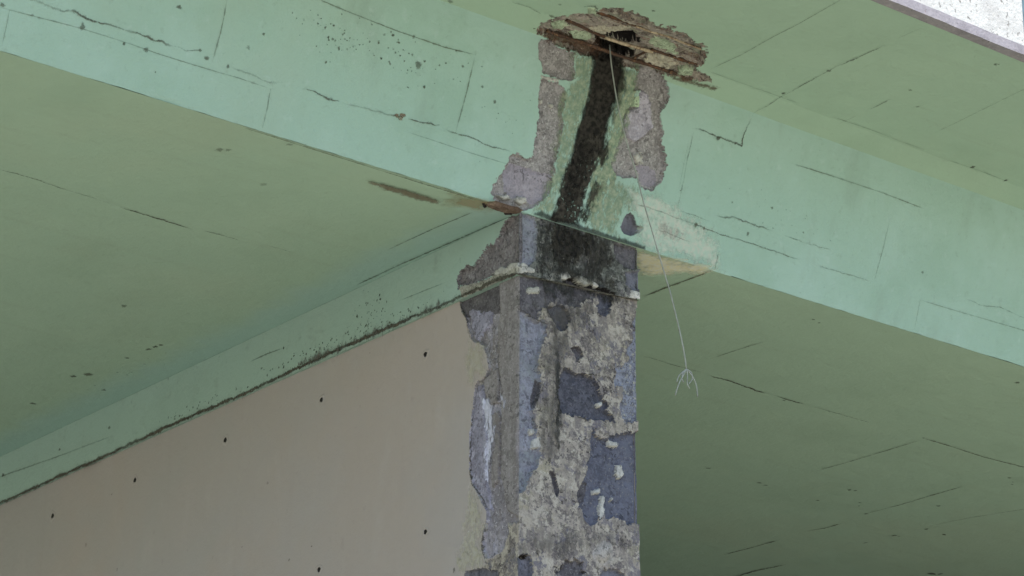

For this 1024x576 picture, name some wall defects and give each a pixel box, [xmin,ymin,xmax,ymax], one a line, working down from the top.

rust [672,75,717,90]
rust [370,182,439,204]
damp [537,36,718,304]
peeling [456,7,712,576]
damp [481,396,506,482]